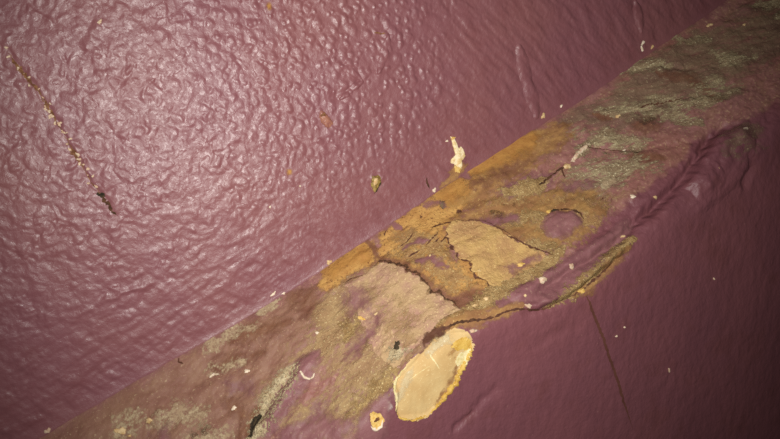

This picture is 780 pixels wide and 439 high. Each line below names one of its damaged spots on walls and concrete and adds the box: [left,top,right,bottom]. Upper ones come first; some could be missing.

crack [4,44,118,221]
peeling [371,175,381,194]
peeling [445,136,471,179]
peeling [445,210,546,286]
crack [507,235,553,256]
crack [436,262,613,333]
peeling [345,257,475,422]
flaking render [370,412,385,432]